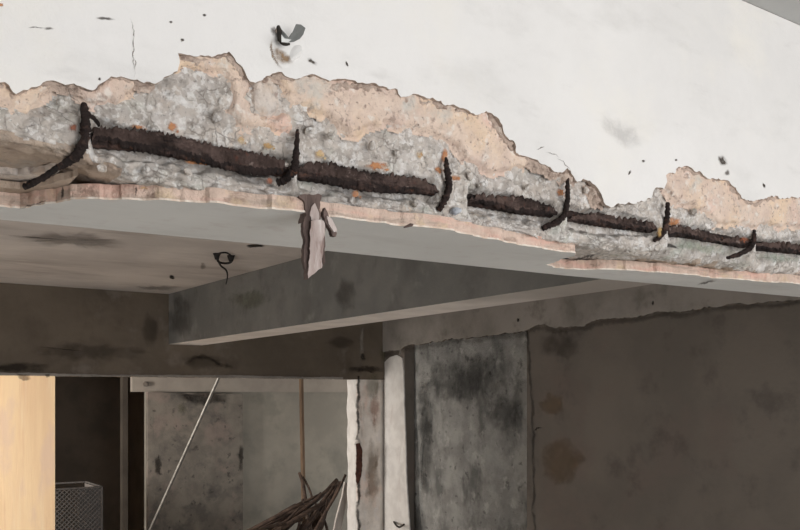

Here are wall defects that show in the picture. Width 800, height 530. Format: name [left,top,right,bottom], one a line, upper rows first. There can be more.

spalling [0,53,800,276]
crack [354,376,362,440]
crack [354,481,362,530]